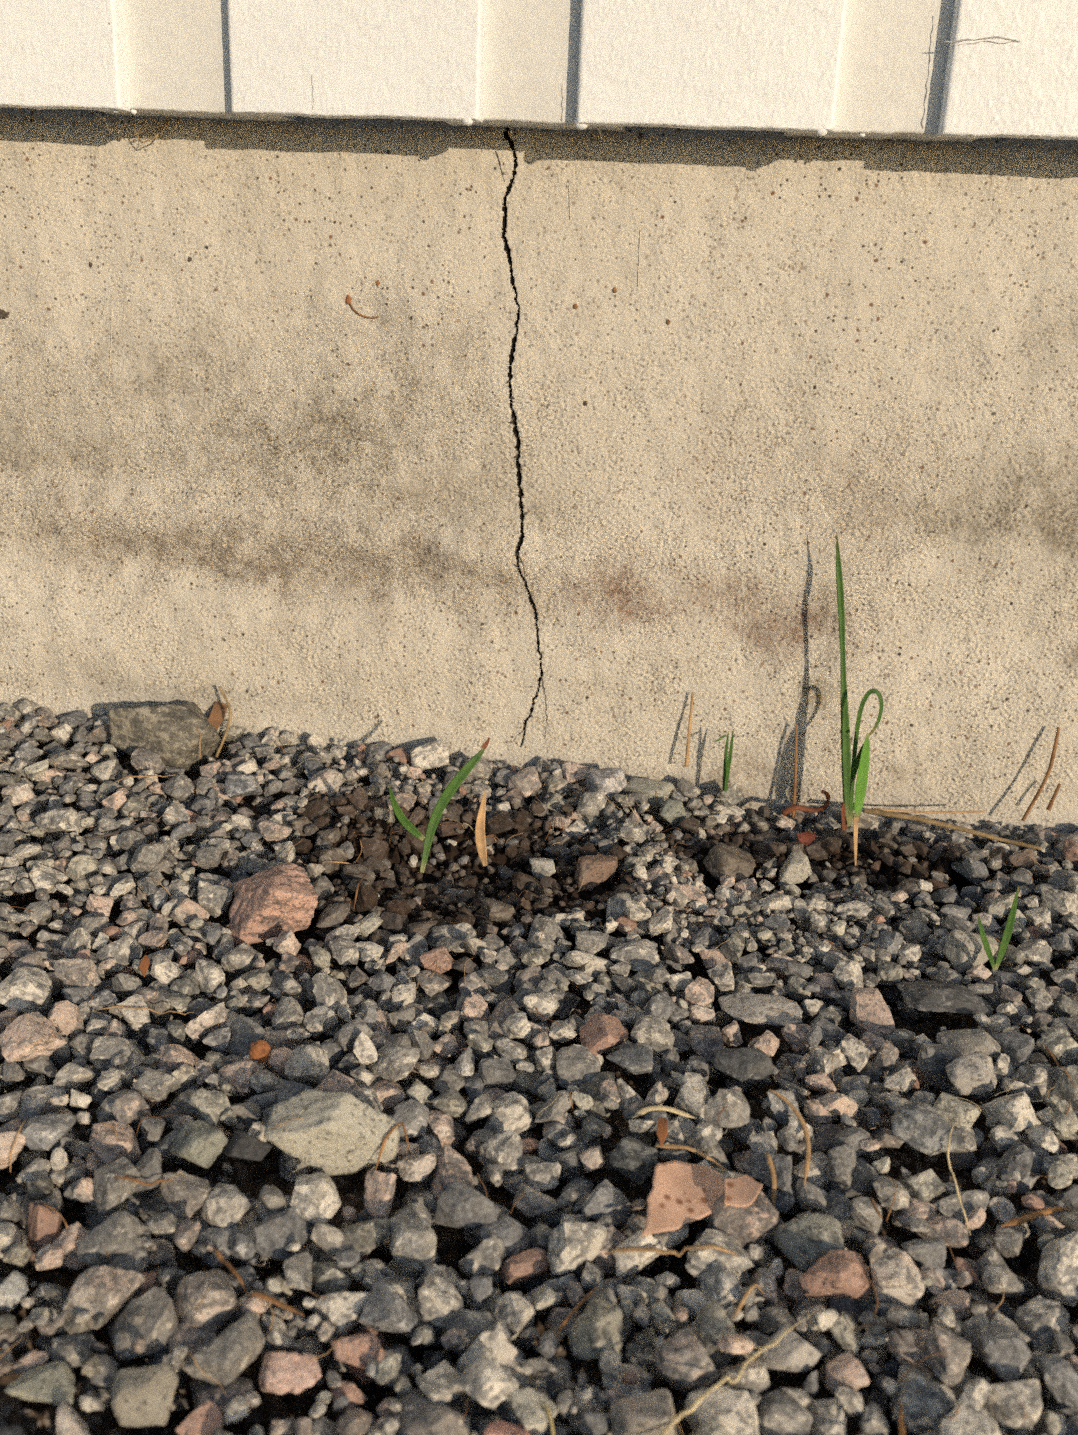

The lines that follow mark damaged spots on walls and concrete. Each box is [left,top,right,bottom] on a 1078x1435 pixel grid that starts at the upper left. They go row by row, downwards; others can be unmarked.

crack [495,127,548,754]